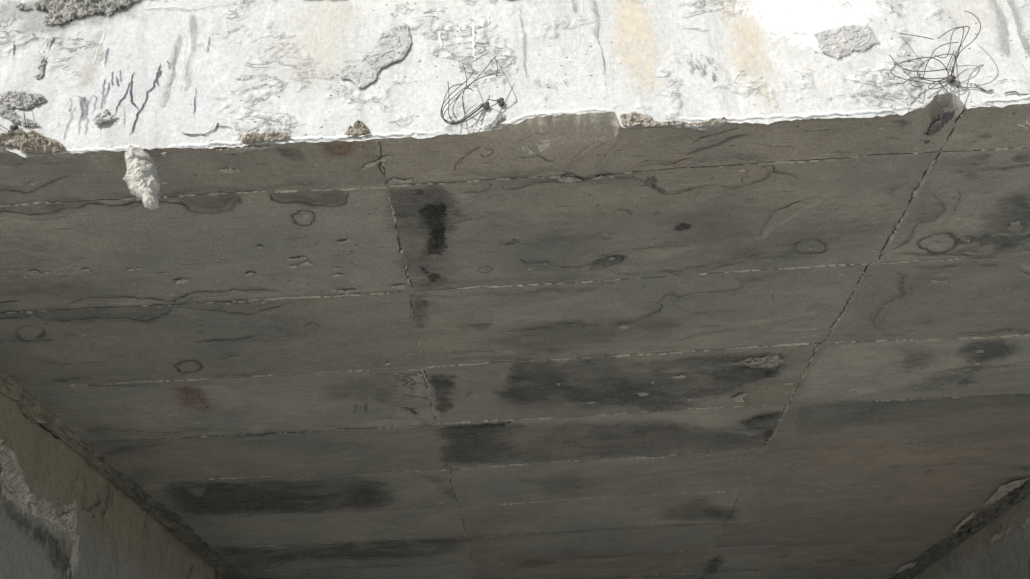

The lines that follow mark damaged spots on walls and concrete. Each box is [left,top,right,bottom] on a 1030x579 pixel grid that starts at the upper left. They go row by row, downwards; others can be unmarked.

crack [115,64,162,133]
crack [183,78,264,142]
crack [957,79,1029,95]
crack [652,128,792,193]
water stain [390,186,578,310]
water stain [899,196,1030,275]
water stain [442,347,786,464]
water stain [169,478,392,516]